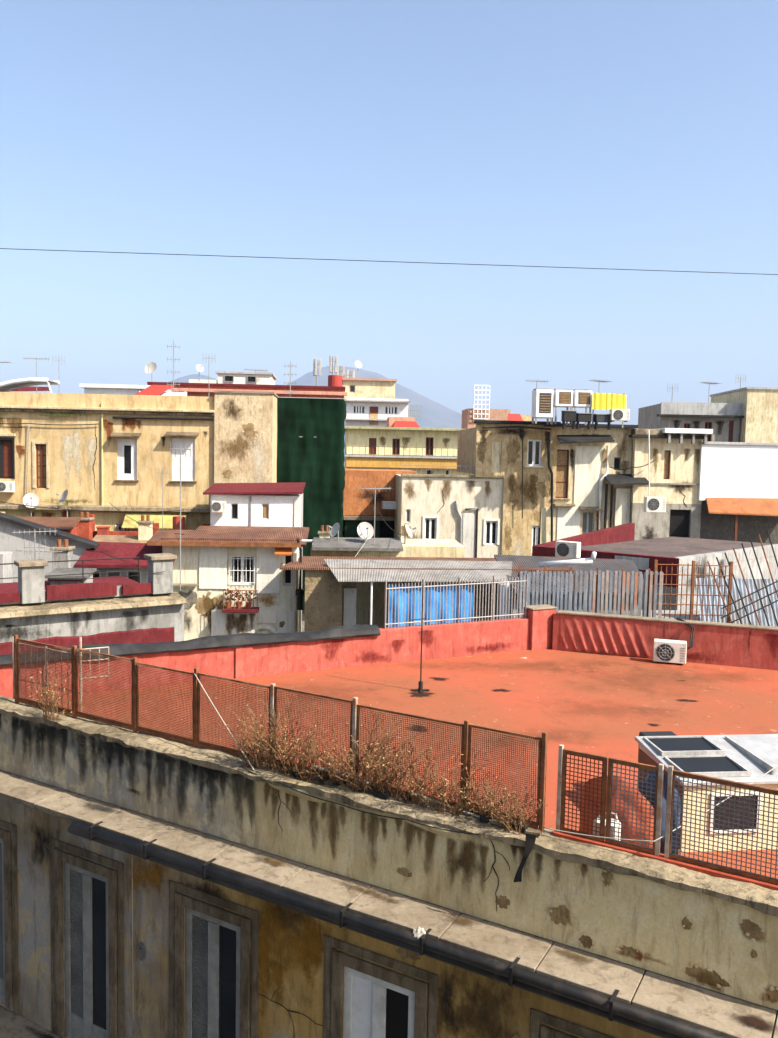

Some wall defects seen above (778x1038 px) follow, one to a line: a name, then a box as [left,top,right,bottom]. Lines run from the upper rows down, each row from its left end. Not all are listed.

leakage [221,436,248,457]
leakage [508,475,537,502]
leakage [12,717,345,861]
leakage [361,812,435,871]
leakage [447,838,488,879]
crack [484,840,510,911]
spalling [549,904,569,925]
spalling [578,933,595,949]
spalling [740,919,765,959]
spalling [685,963,731,988]
crack [258,987,323,1036]
leakage [439,978,512,1038]